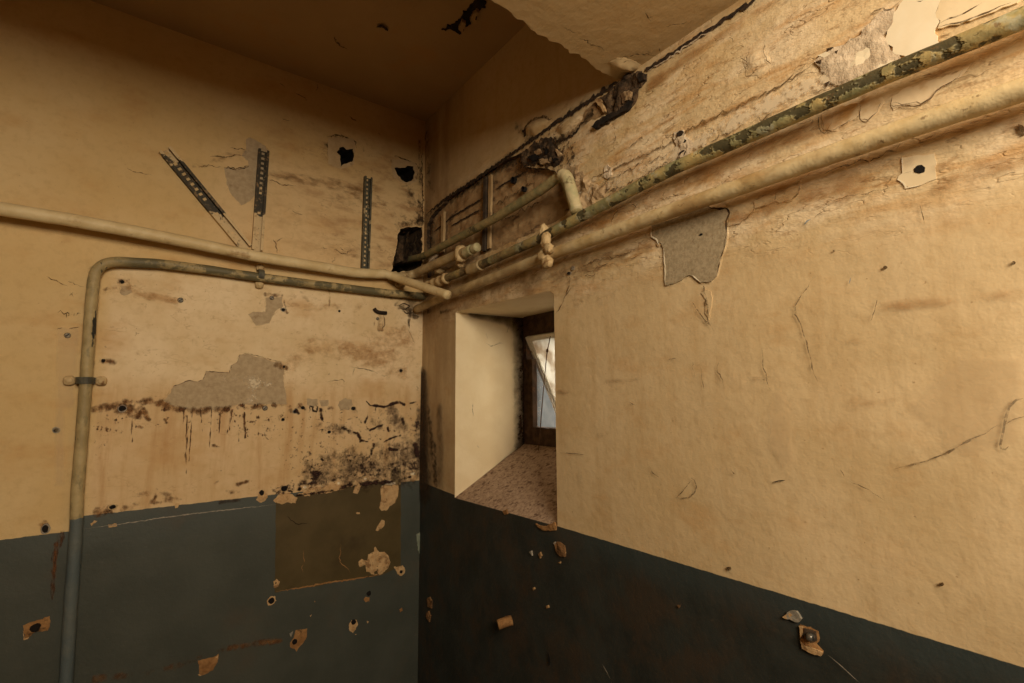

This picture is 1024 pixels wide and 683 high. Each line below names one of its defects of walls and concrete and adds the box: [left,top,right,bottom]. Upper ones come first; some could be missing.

peeling [441,0,487,35]
spalling [814,8,901,86]
leakage [691,75,830,149]
peeling [216,137,271,206]
spalling [390,133,617,278]
peeling [651,179,801,320]
crack [794,286,817,379]
peeling [162,353,288,413]
leakage [273,370,437,497]
crack [896,399,1022,469]
peeling [256,468,418,531]
peeling [359,547,405,576]